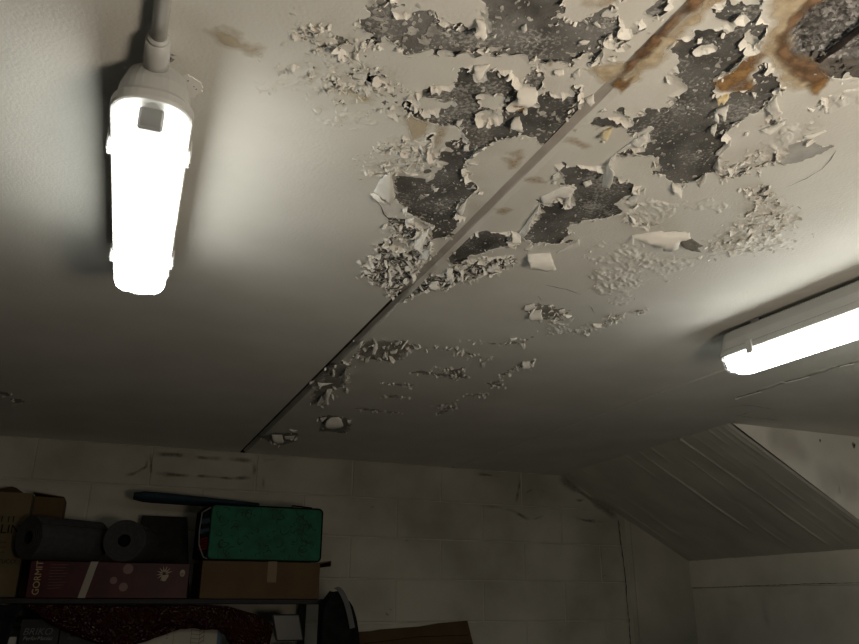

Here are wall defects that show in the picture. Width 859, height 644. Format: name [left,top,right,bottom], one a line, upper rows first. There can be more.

rust [595,0,721,91]
spalling [788,0,859,85]
peeling [806,95,844,113]
peeling [273,0,836,303]
peeling [309,336,537,434]